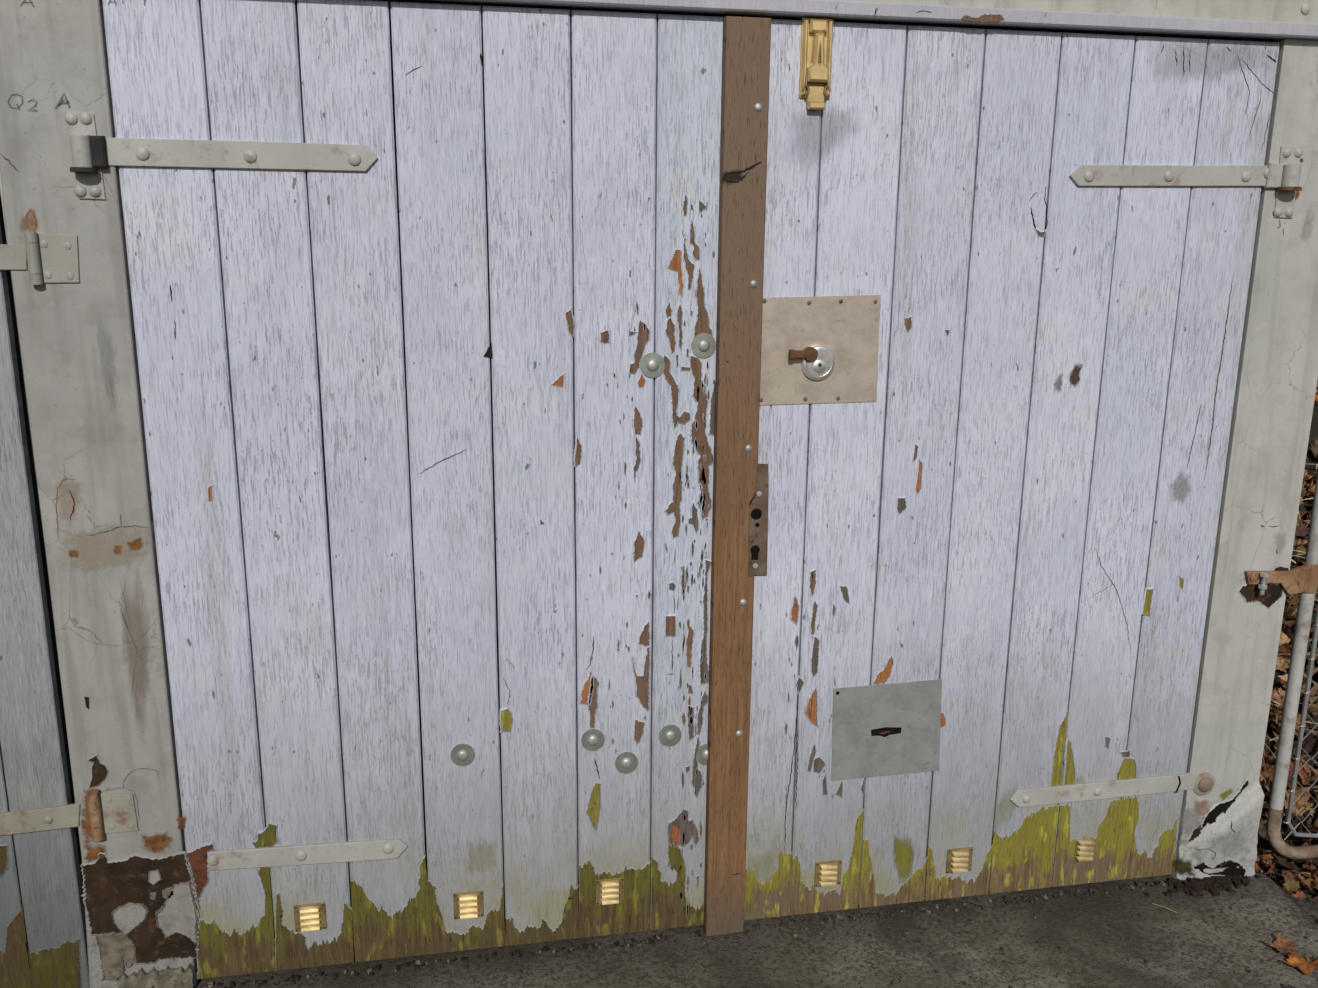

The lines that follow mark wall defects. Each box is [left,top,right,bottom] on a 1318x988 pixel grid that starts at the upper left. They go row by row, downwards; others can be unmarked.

peeling [896,443,923,514]
peeling [197,193,715,979]
peeling [1141,587,1154,617]
corrosion [1238,567,1289,609]
peeling [787,568,850,798]
peeling [872,653,894,685]
peeling [1049,709,1076,787]
peeling [1104,735,1137,780]
peeling [744,778,1178,920]
spalling [1194,860,1246,877]